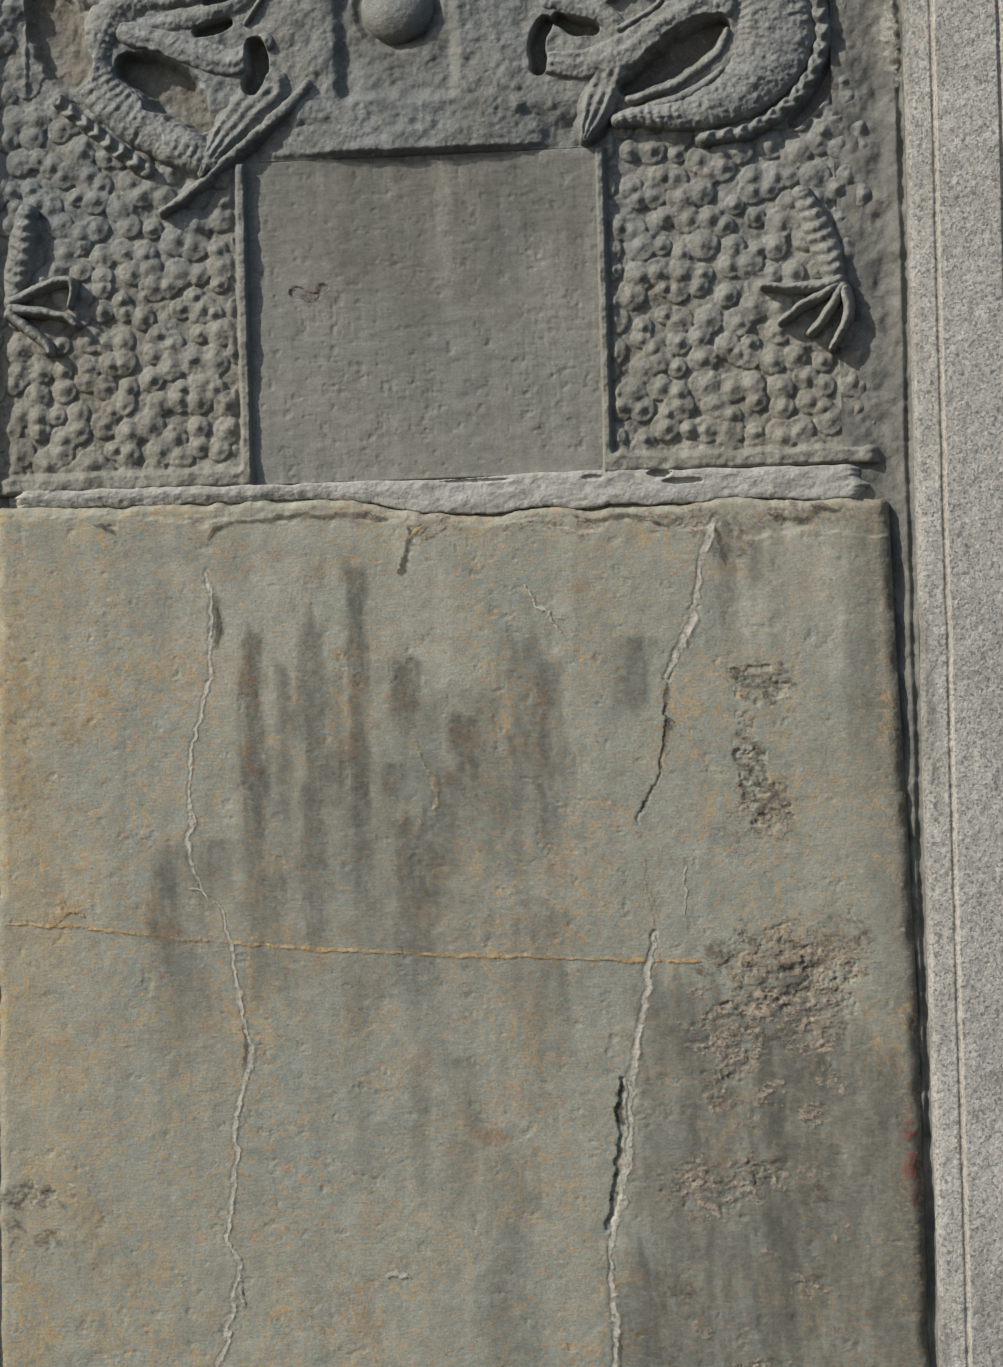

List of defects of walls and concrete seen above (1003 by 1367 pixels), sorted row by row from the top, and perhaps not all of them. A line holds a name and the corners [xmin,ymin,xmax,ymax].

crack [768,504,840,521]
water stain [241,633,267,833]
spalling [727,662,796,855]
crack [5,512,849,1367]
spalling [675,911,874,1129]
spalling [654,1146,831,1226]